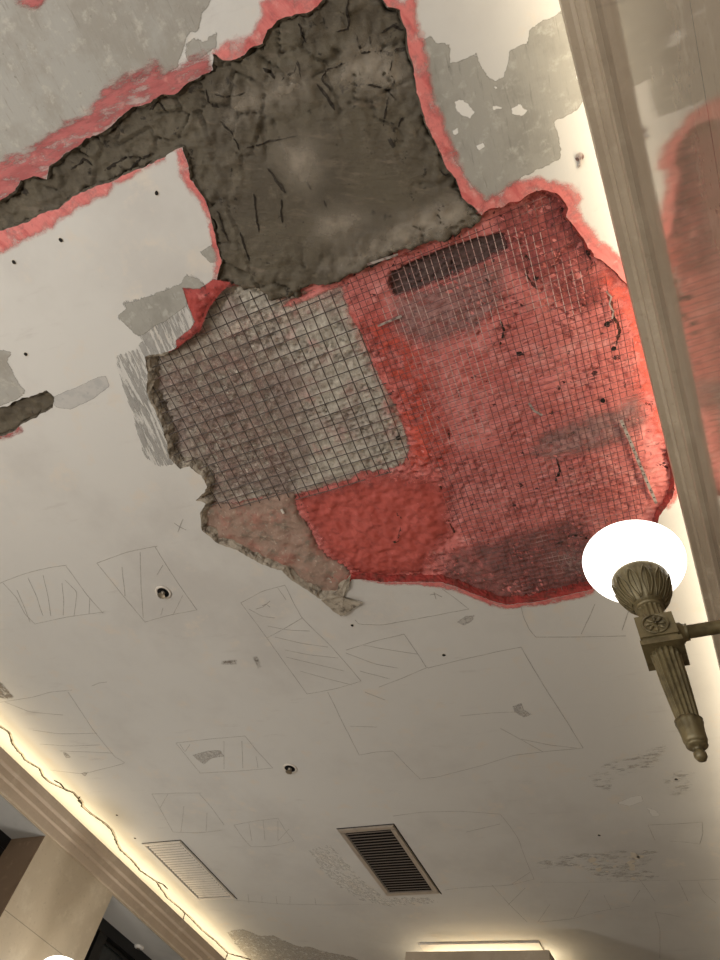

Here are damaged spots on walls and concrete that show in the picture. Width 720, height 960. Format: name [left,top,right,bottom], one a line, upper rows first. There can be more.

flaking render [0,0,677,616]
crack [0,725,251,960]